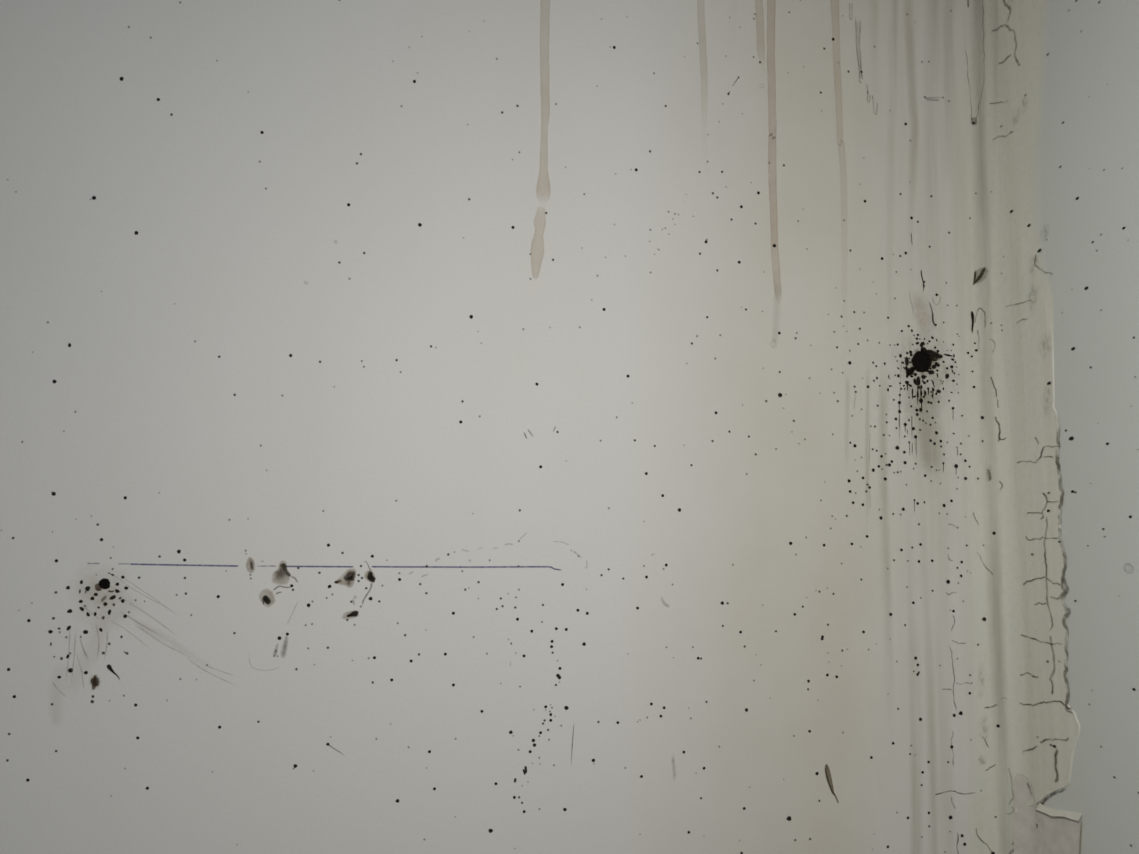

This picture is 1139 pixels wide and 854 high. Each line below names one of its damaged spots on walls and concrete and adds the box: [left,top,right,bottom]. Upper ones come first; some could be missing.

leakage [846,311,979,517]
peeling [939,0,1082,854]
crack [989,378,1071,781]